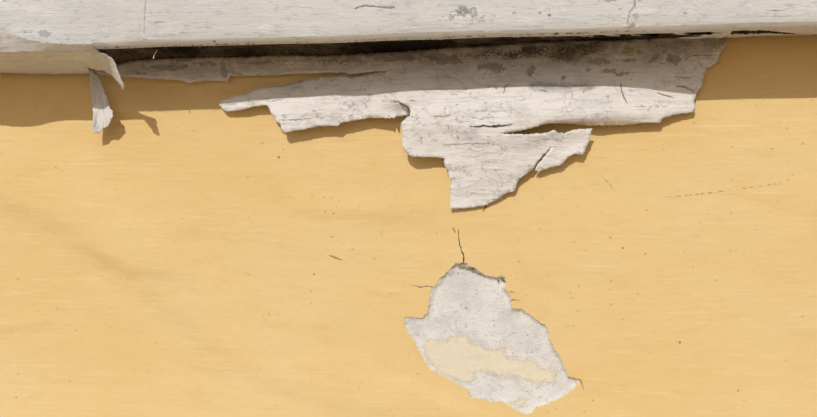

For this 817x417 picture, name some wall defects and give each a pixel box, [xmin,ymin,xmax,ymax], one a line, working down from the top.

peeling [444,5,484,23]
crack [627,0,641,27]
peeling [0,26,817,209]
spalling [404,262,579,414]